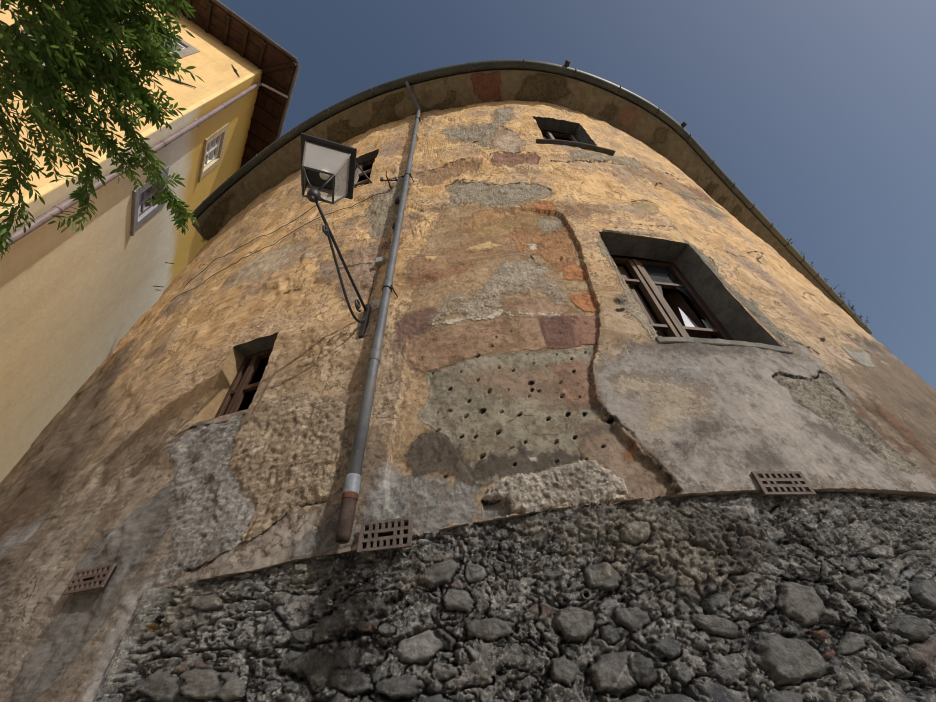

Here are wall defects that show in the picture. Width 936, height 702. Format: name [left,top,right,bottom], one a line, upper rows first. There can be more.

flaking render [223,71,680,520]
flaking render [141,394,357,592]
crack [599,399,683,493]
flaking render [772,369,922,474]